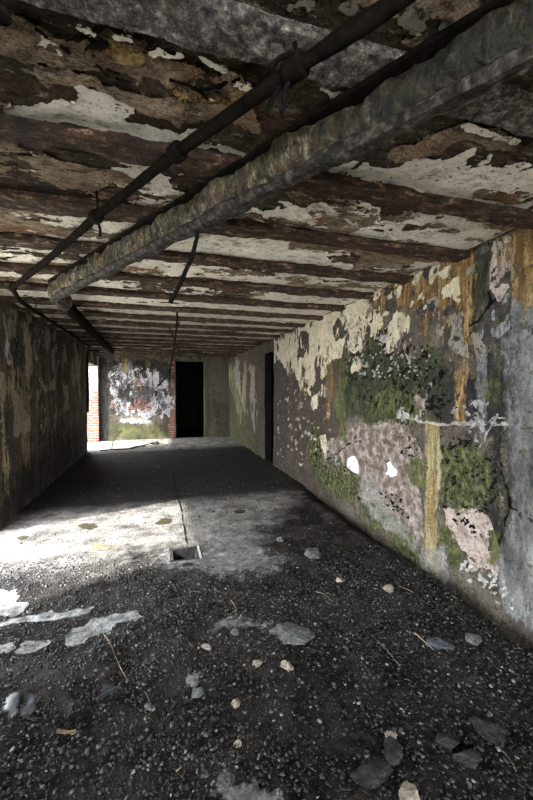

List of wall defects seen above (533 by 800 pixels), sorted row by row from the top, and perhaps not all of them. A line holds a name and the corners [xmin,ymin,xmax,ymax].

corrosion [82,41,150,70]
flaking render [76,24,184,59]
peeling [0,84,196,143]
corrosion [169,84,251,106]
peeling [460,120,521,145]
flaking render [0,141,150,200]
peeling [127,173,185,209]
peeling [327,147,533,211]
peeling [0,190,533,554]
leakage [0,417,86,523]
mould [308,438,361,500]
leakage [342,289,533,634]